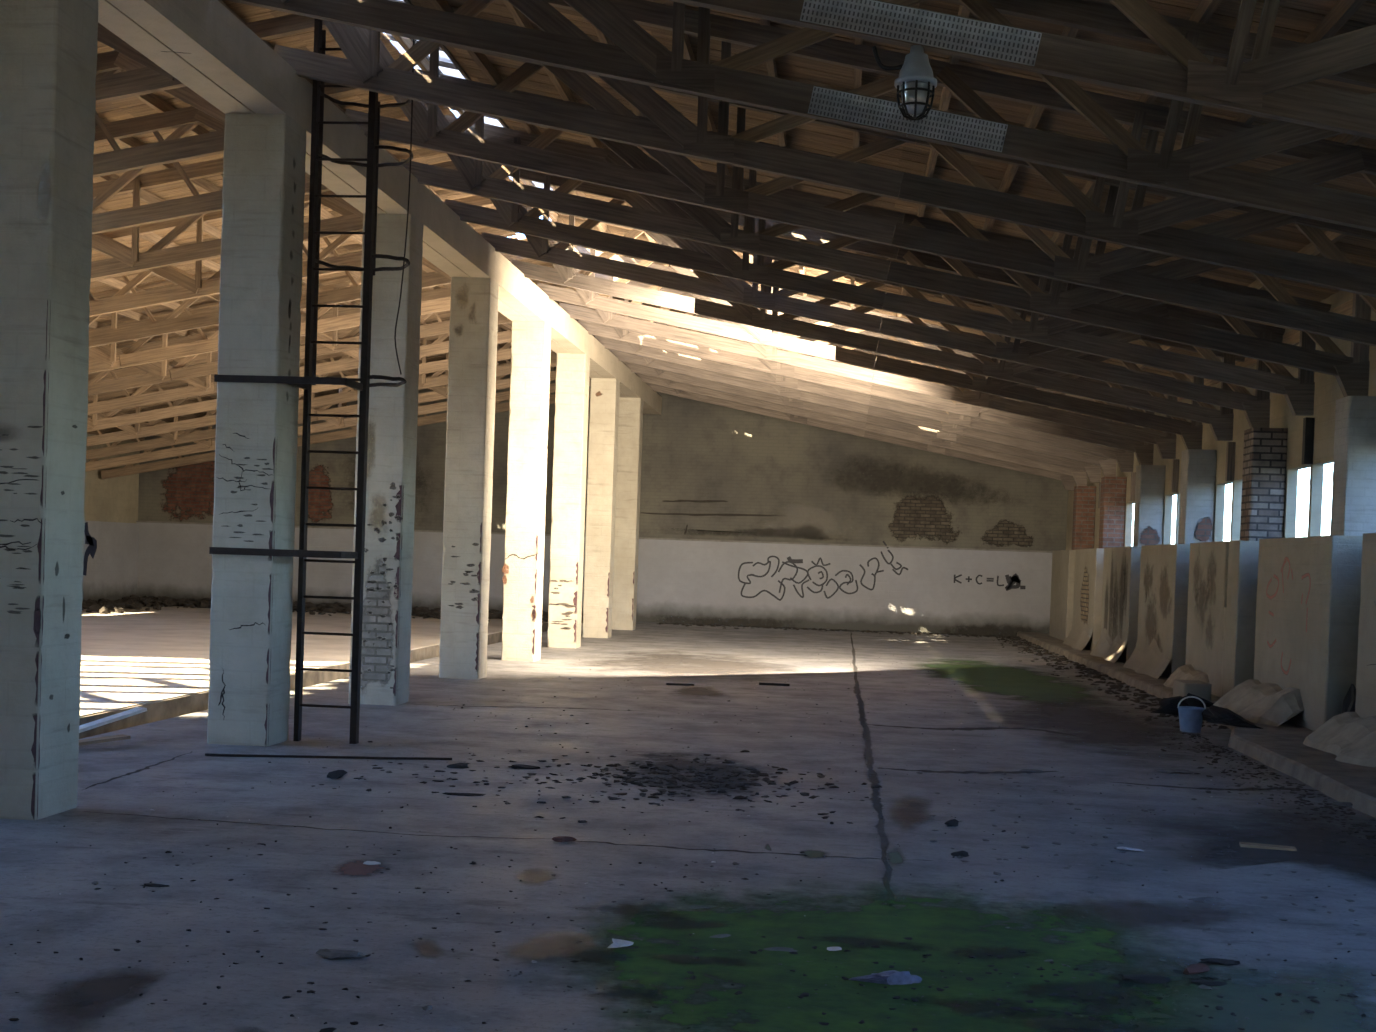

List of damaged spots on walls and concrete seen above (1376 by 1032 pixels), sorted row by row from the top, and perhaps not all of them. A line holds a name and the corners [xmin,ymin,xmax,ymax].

spalling [0,300,65,819]
flaking render [161,438,277,684]
flaking render [361,482,404,695]
flaking render [888,495,960,544]
flaking render [982,520,1033,547]
damp [620,753,760,799]
crack [579,631,1071,898]